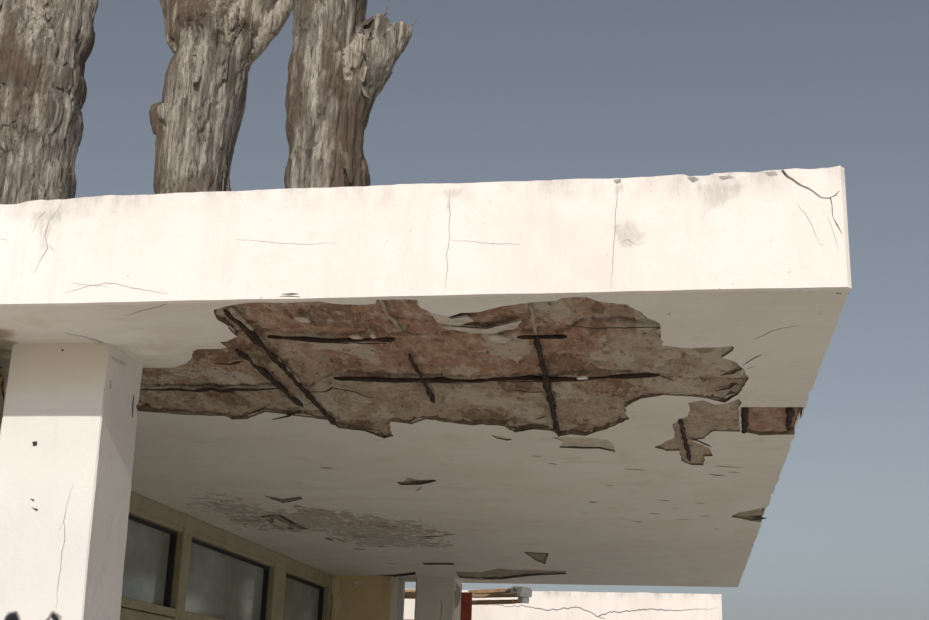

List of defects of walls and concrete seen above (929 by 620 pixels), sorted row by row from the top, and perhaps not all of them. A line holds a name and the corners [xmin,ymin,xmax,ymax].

crack [33,205,61,269]
crack [445,191,519,287]
crack [799,190,842,249]
crack [64,282,168,316]
spalling [132,293,800,464]
flaking render [455,552,565,608]
crack [497,604,717,619]